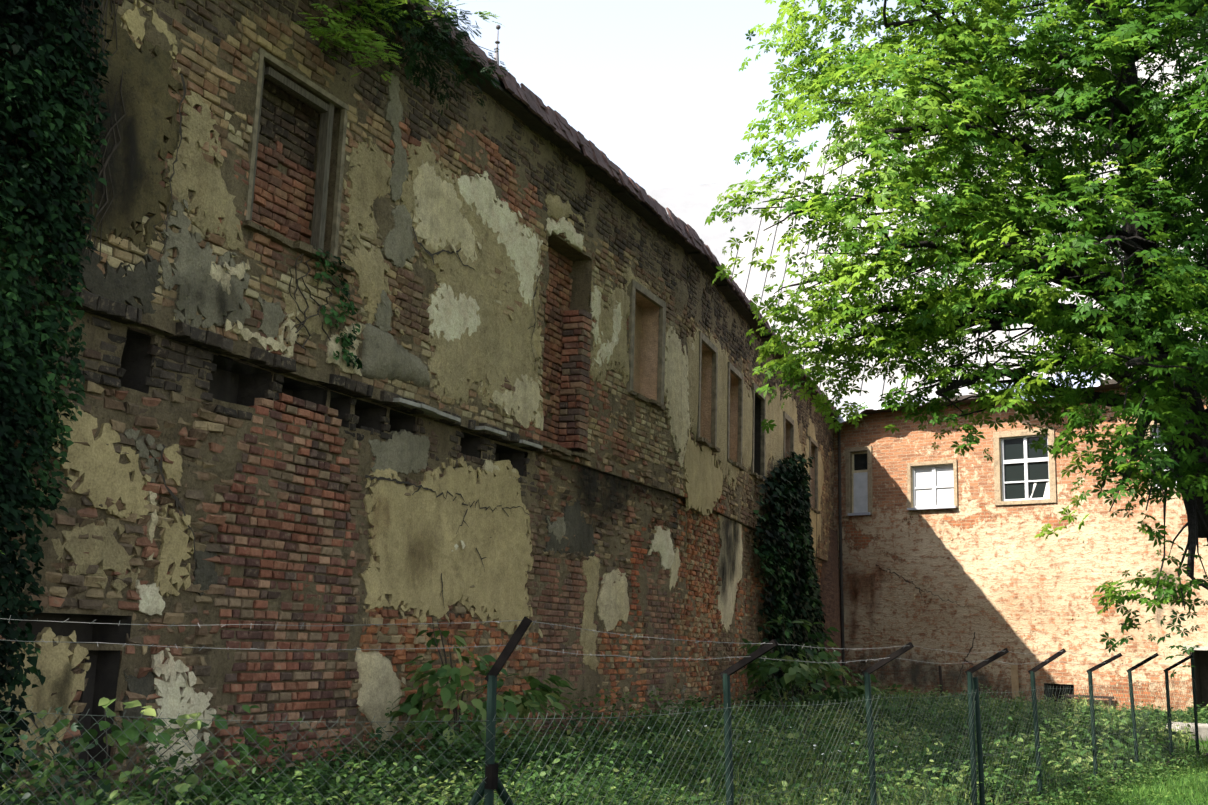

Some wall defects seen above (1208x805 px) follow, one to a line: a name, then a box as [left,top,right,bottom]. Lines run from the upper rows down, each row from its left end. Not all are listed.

peeling [25,0,585,431]
peeling [42,401,219,615]
peeling [579,551,630,671]